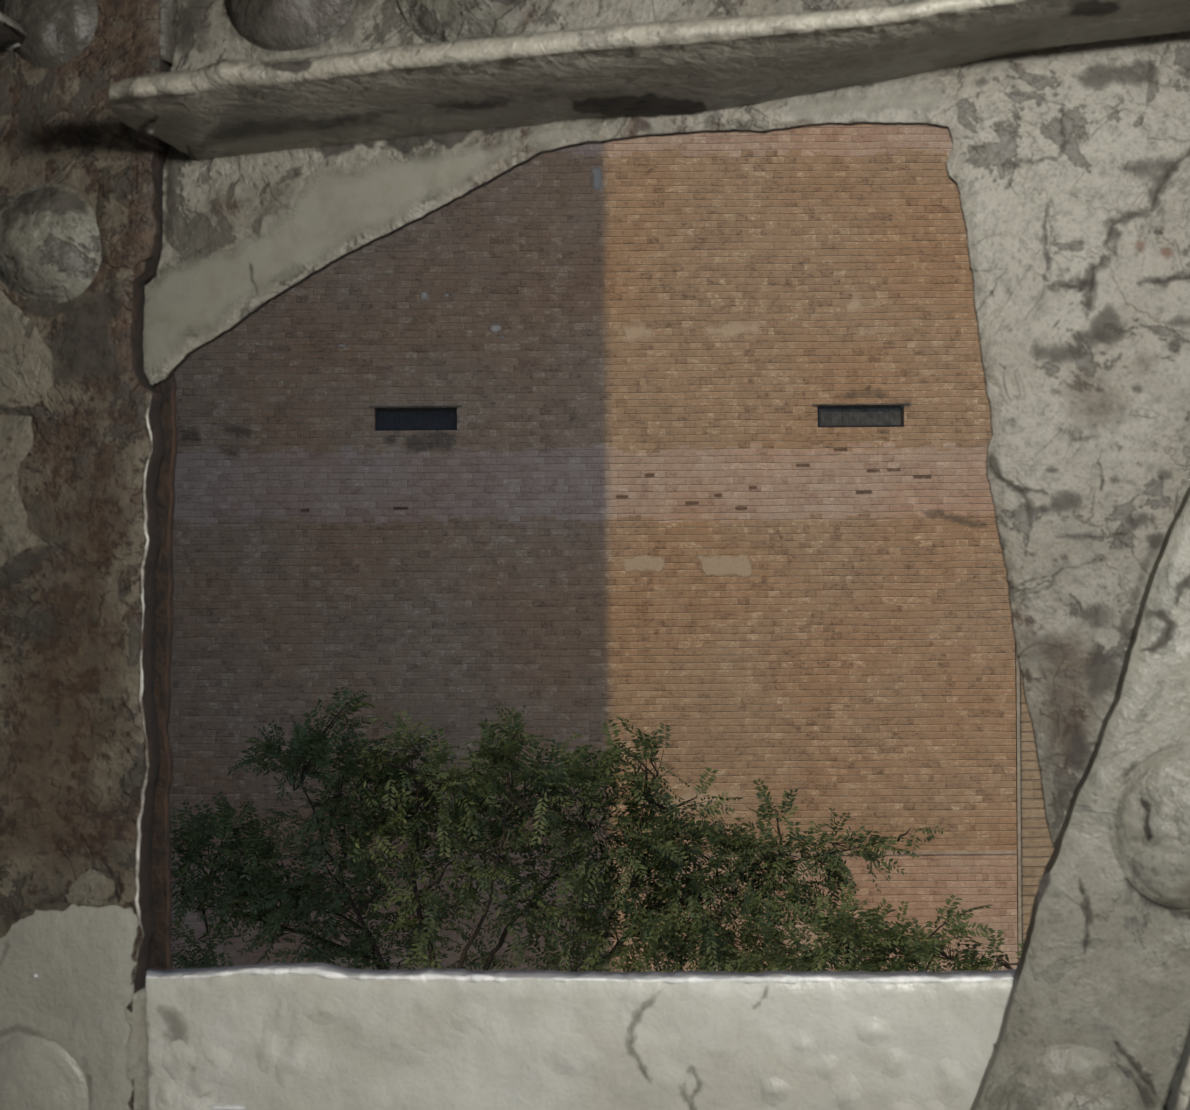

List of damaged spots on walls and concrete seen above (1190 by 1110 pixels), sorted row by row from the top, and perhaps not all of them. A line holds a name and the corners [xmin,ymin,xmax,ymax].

crack [1045,152,1190,305]
crack [990,455,1043,517]
crack [1143,576,1190,650]